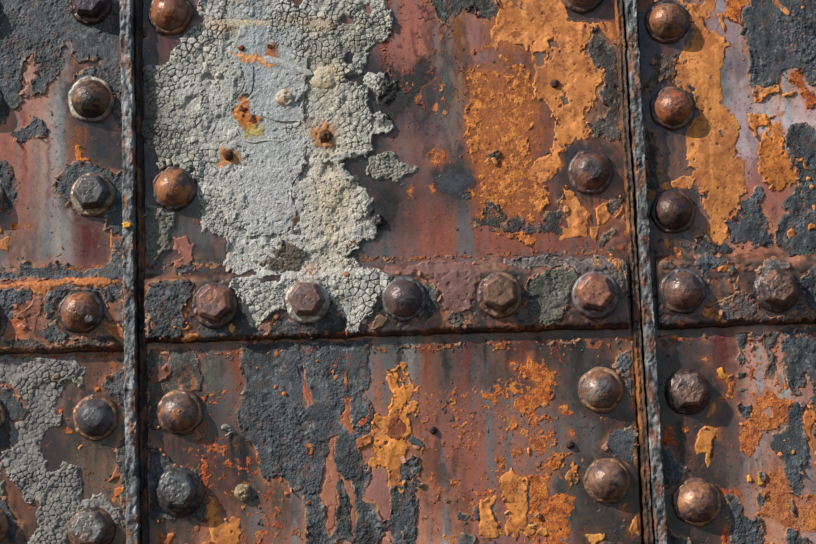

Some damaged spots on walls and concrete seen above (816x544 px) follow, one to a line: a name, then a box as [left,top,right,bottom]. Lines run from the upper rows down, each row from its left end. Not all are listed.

corrosion [0,247,116,295]
peeling [0,0,122,143]
peeling [0,160,126,544]
crack [236,26,312,226]
peeling [141,0,482,544]
corrosion [352,0,638,262]
corrosion [661,335,799,472]
corrosion [647,0,816,251]
peeling [693,122,816,282]
peeling [708,264,816,518]
peeling [740,0,816,96]
corrosion [754,467,816,533]